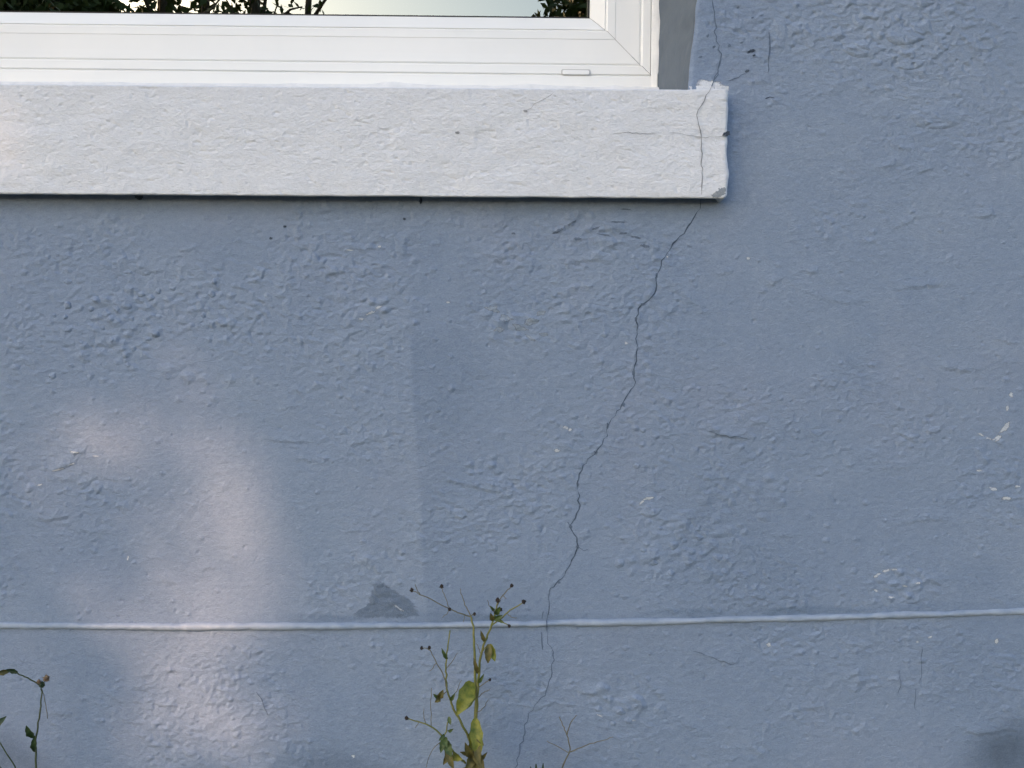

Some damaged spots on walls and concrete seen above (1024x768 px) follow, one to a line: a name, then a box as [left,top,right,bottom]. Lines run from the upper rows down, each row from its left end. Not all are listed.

crack [515,1,725,768]